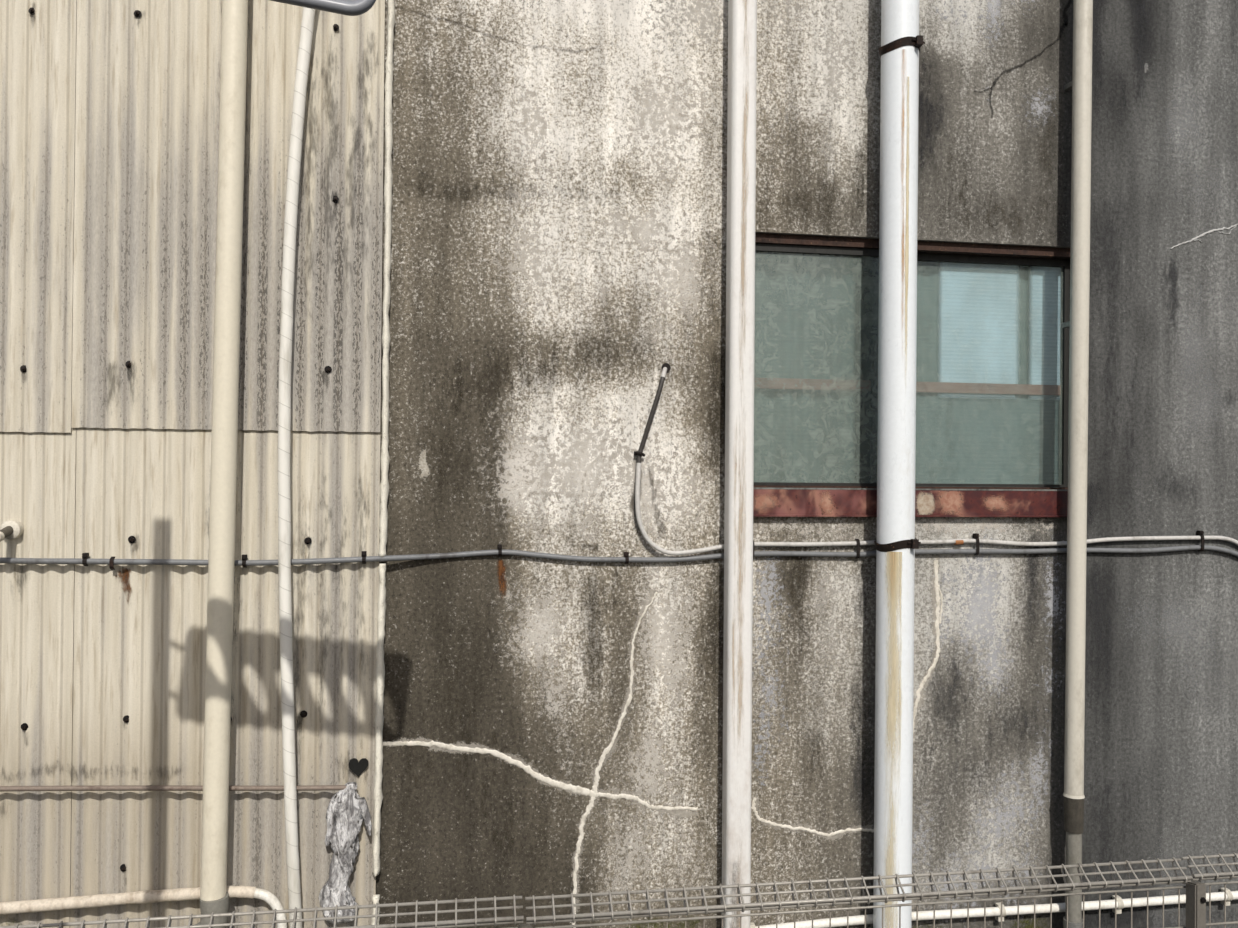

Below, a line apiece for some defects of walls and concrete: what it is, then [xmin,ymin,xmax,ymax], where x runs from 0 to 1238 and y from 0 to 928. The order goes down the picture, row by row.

crack [974,0,1072,113]
crack [1170,224,1238,249]
leakage [710,355,726,461]
rust [498,560,506,594]
leakage [1028,546,1038,610]
leakage [708,574,742,718]
crack [913,555,943,794]
crack [382,588,698,928]
crack [751,795,874,842]